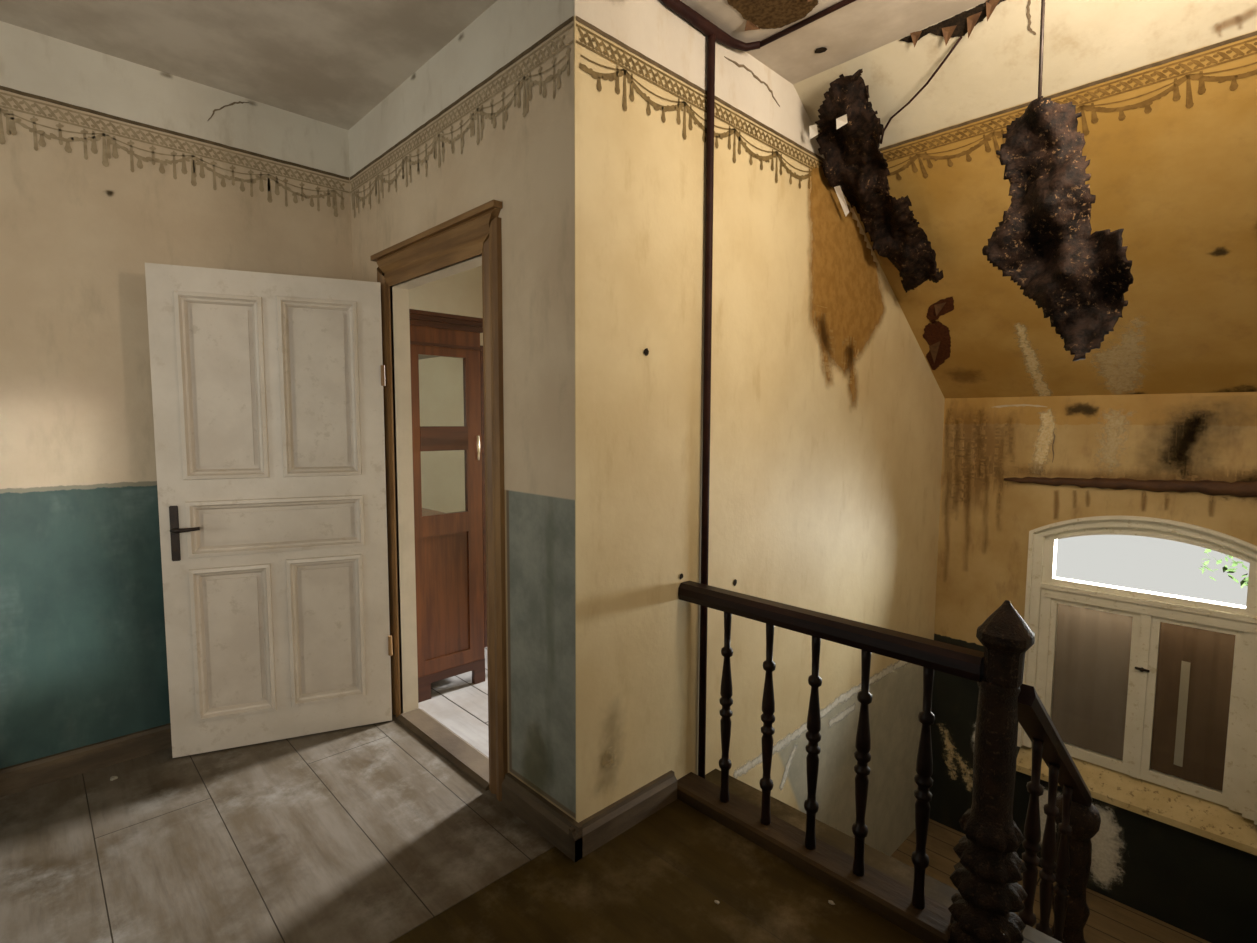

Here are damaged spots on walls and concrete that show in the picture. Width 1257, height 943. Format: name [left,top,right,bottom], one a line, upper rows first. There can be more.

peeling [727,0,819,31]
flaking render [899,0,1006,48]
peeling [923,297,954,370]
peeling [939,727,973,791]
peeling [1039,790,1059,844]
peeling [1090,803,1123,886]